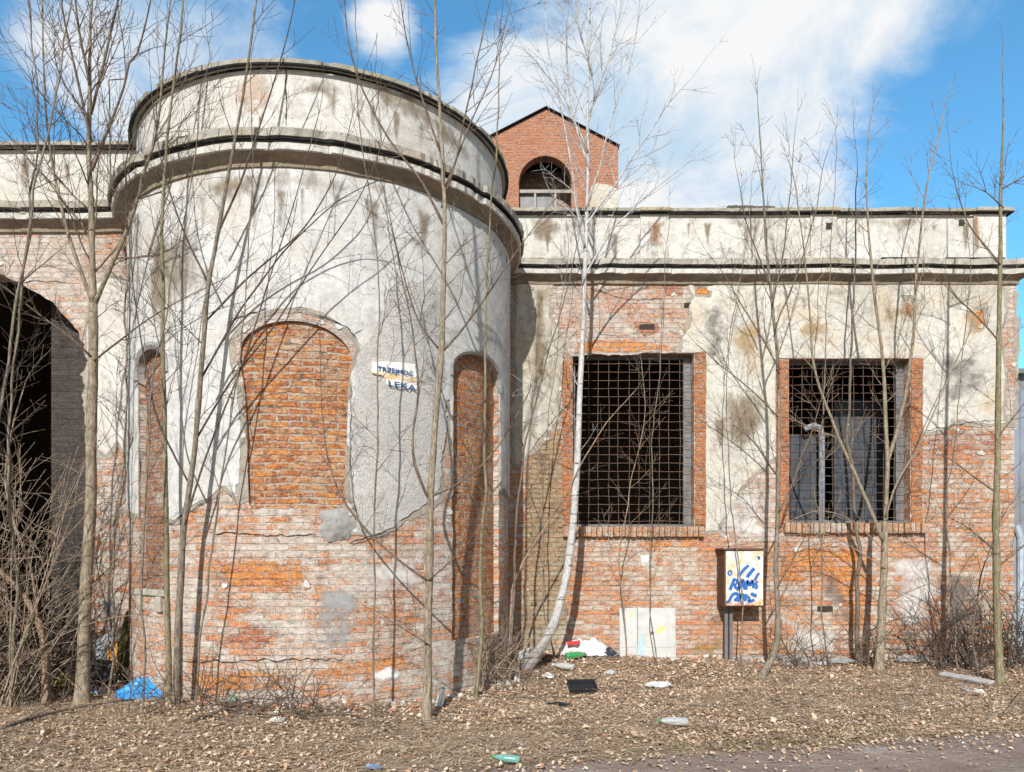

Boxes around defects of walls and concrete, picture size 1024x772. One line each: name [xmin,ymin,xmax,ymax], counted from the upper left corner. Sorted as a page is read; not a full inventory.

leakage [420,213,428,242]
leakage [151,237,187,312]
flaking render [551,284,713,356]
leakage [717,396,759,447]
flaking render [437,407,453,554]
crack [209,532,310,543]
flaking render [217,554,311,597]
spalling [214,622,293,650]
flaking render [191,669,301,695]
flaking render [325,652,414,687]